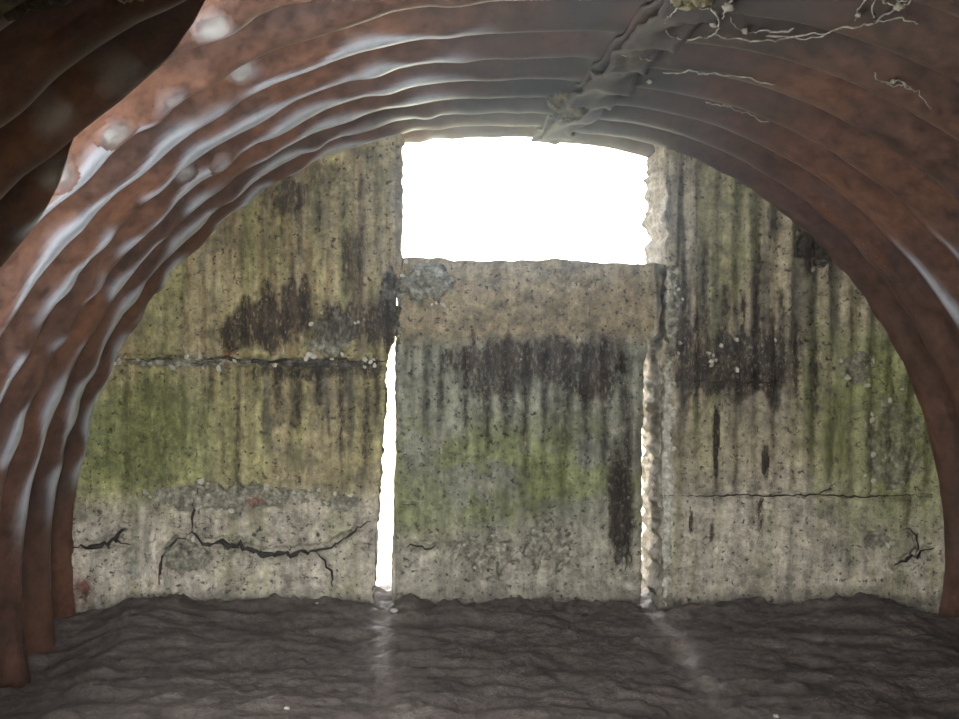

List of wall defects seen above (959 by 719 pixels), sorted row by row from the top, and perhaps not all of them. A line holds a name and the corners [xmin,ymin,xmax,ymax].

crack [73,528,130,550]
crack [158,488,371,587]
damp [220,275,394,464]
damp [440,331,632,557]
damp [673,244,799,477]
crack [894,528,934,566]